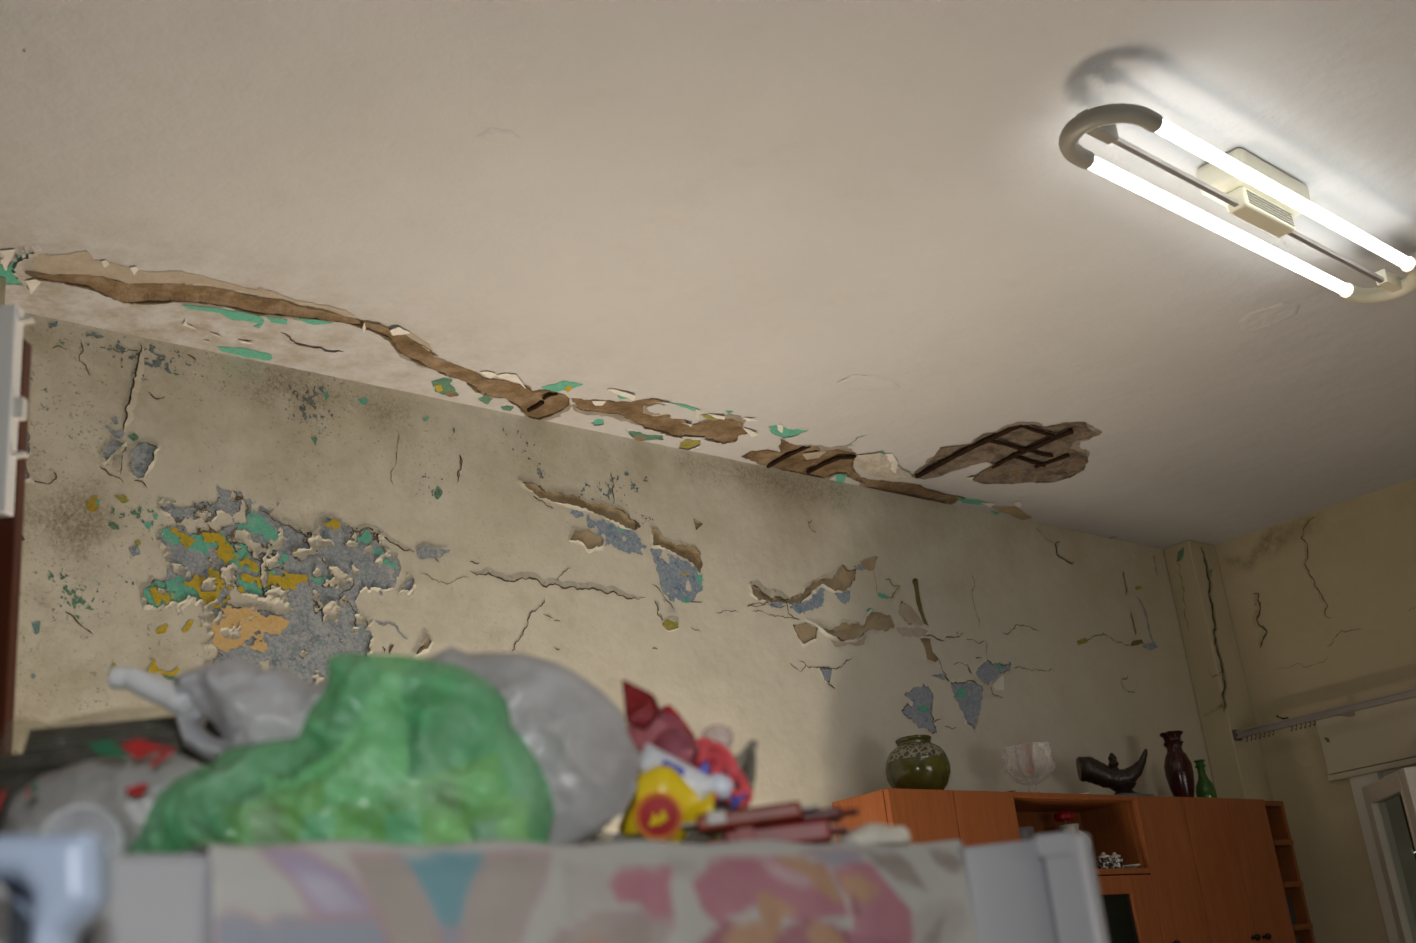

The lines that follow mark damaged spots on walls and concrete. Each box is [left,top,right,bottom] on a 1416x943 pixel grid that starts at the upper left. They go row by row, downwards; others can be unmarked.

spalling [0,244,1102,632]
peeling [48,416,450,685]
crack [423,561,645,651]
peeling [747,556,1011,734]
crack [1154,547,1229,715]
crack [1252,516,1358,669]